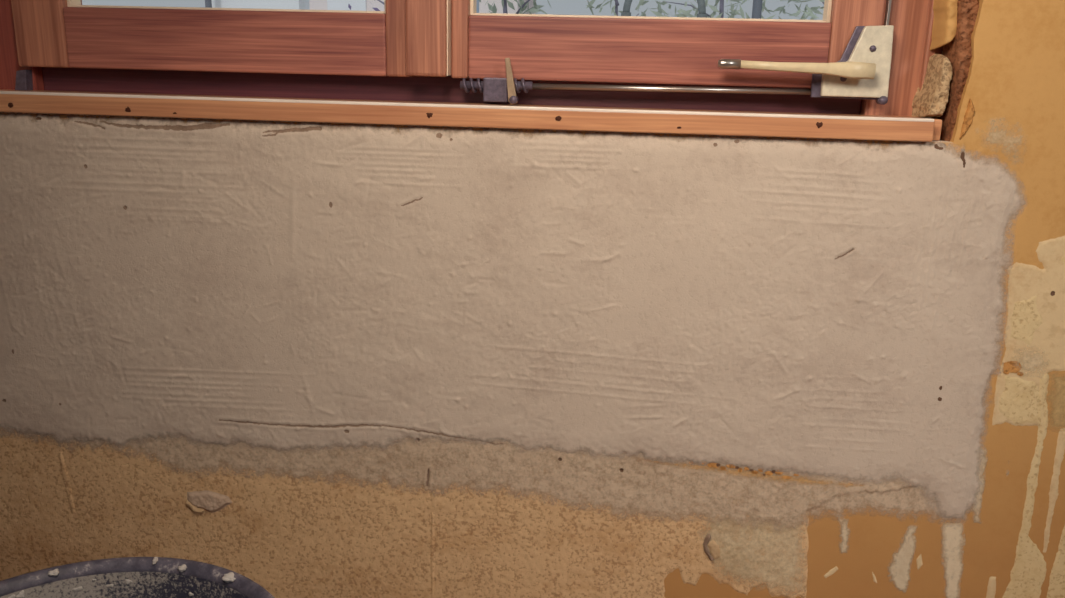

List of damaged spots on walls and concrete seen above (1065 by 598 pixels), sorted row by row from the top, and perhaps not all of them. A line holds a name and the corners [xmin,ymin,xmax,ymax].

spalling [959,99,975,140]
peeling [992,236,1065,426]
crack [219,419,503,445]
spalling [689,461,799,479]
peeling [703,533,721,561]